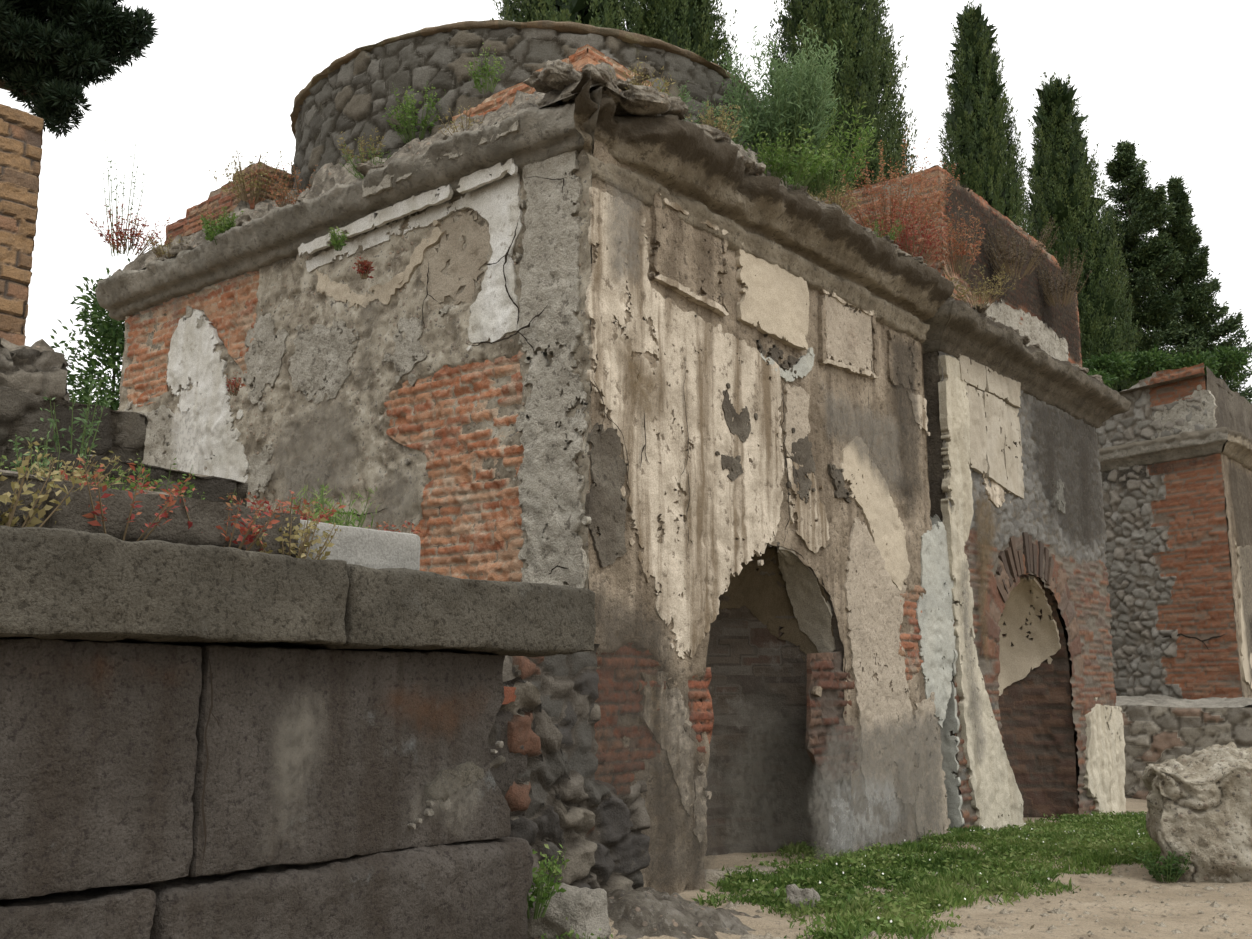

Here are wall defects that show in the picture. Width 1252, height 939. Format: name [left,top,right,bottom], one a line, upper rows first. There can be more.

flaking render [478,114,520,145]
flaking render [122,271,360,498]
flaking render [298,150,1069,844]
water stain [828,345,920,500]
flaking render [1082,697,1126,815]